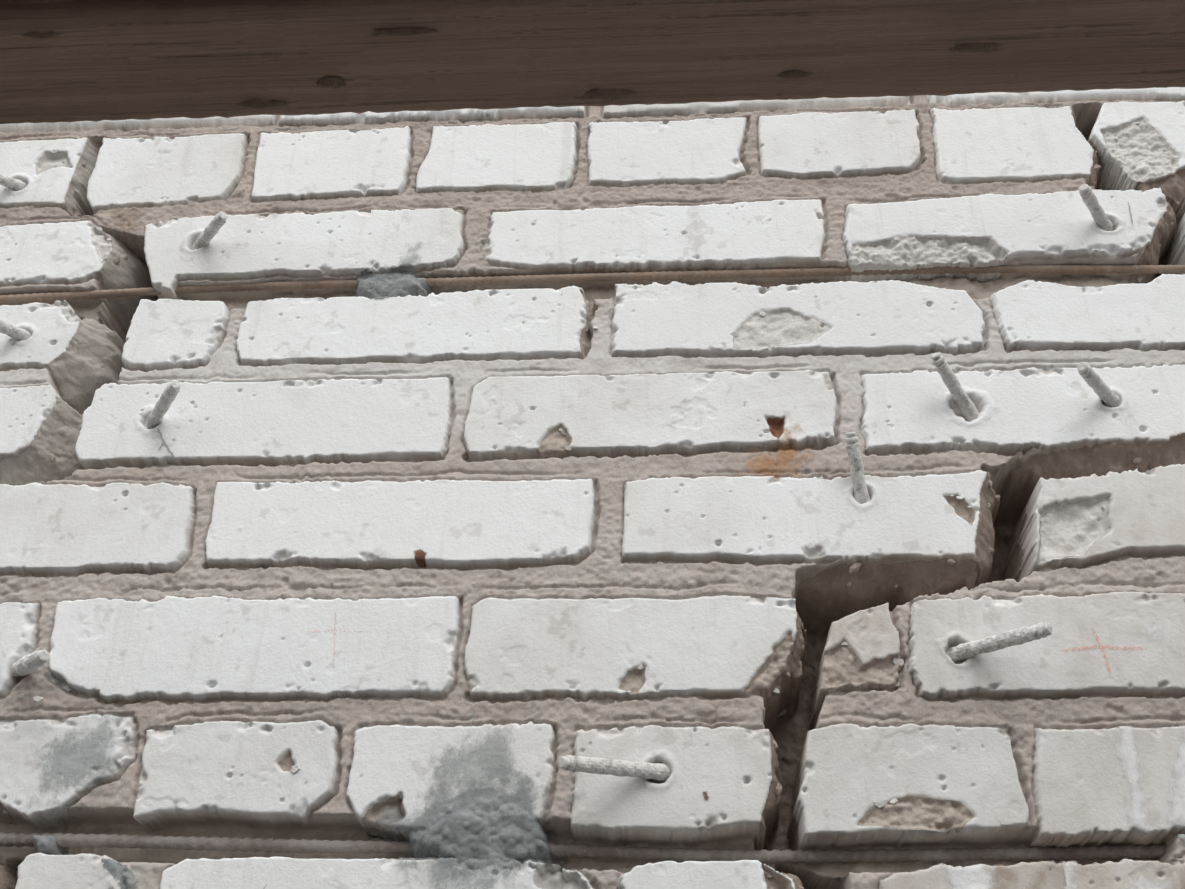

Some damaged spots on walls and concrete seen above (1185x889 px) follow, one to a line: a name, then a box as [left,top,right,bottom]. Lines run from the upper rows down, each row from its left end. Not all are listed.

crack [1073,111,1105,190]
spalling [1099,118,1180,190]
crack [1127,169,1185,284]
crack [0,140,159,486]
spalling [425,236,1185,358]
corrosion [748,431,805,476]
crack [758,433,1185,889]
spalling [0,794,415,854]
leakage [368,735,566,889]
spalling [857,796,974,833]
crack [0,863,18,889]
spalling [532,843,1166,889]